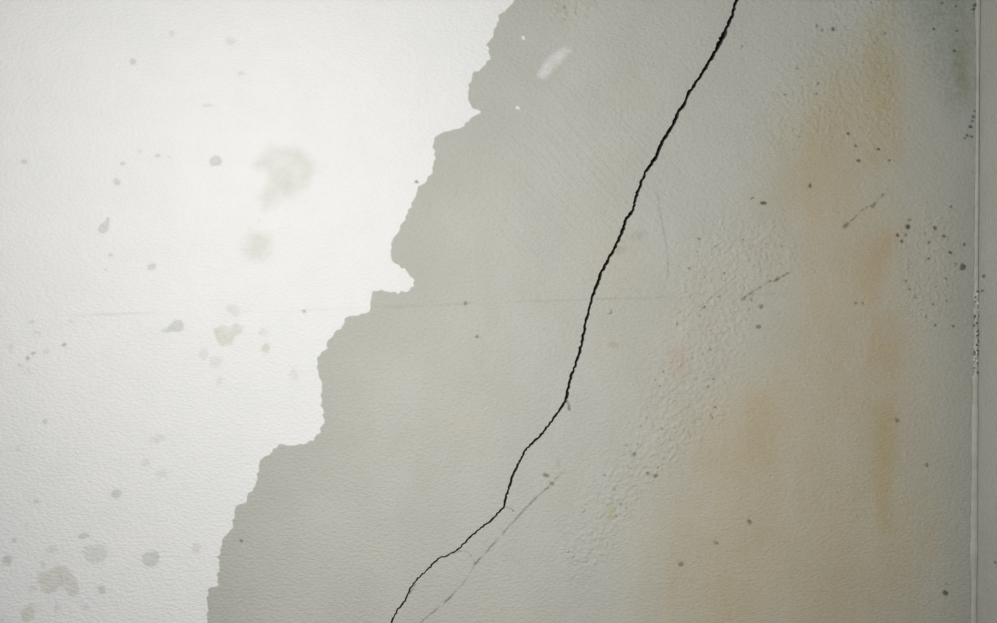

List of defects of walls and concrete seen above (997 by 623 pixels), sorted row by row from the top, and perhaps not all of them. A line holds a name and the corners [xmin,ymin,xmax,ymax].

crack [391,0,739,623]
damp [204,0,997,623]
spalling [973,290,983,374]